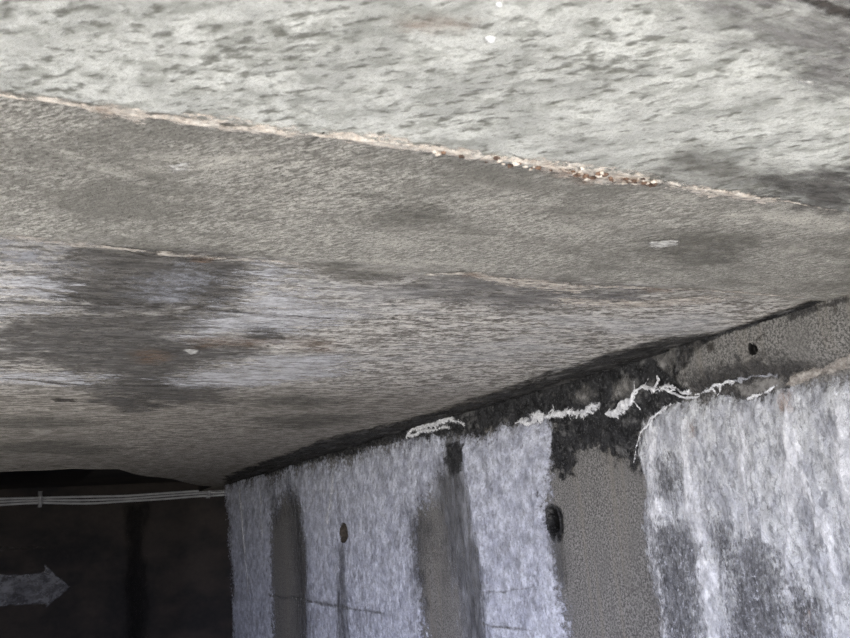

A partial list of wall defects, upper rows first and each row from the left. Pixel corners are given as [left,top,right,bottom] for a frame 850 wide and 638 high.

damp [0,243,360,412]
damp [223,333,850,638]